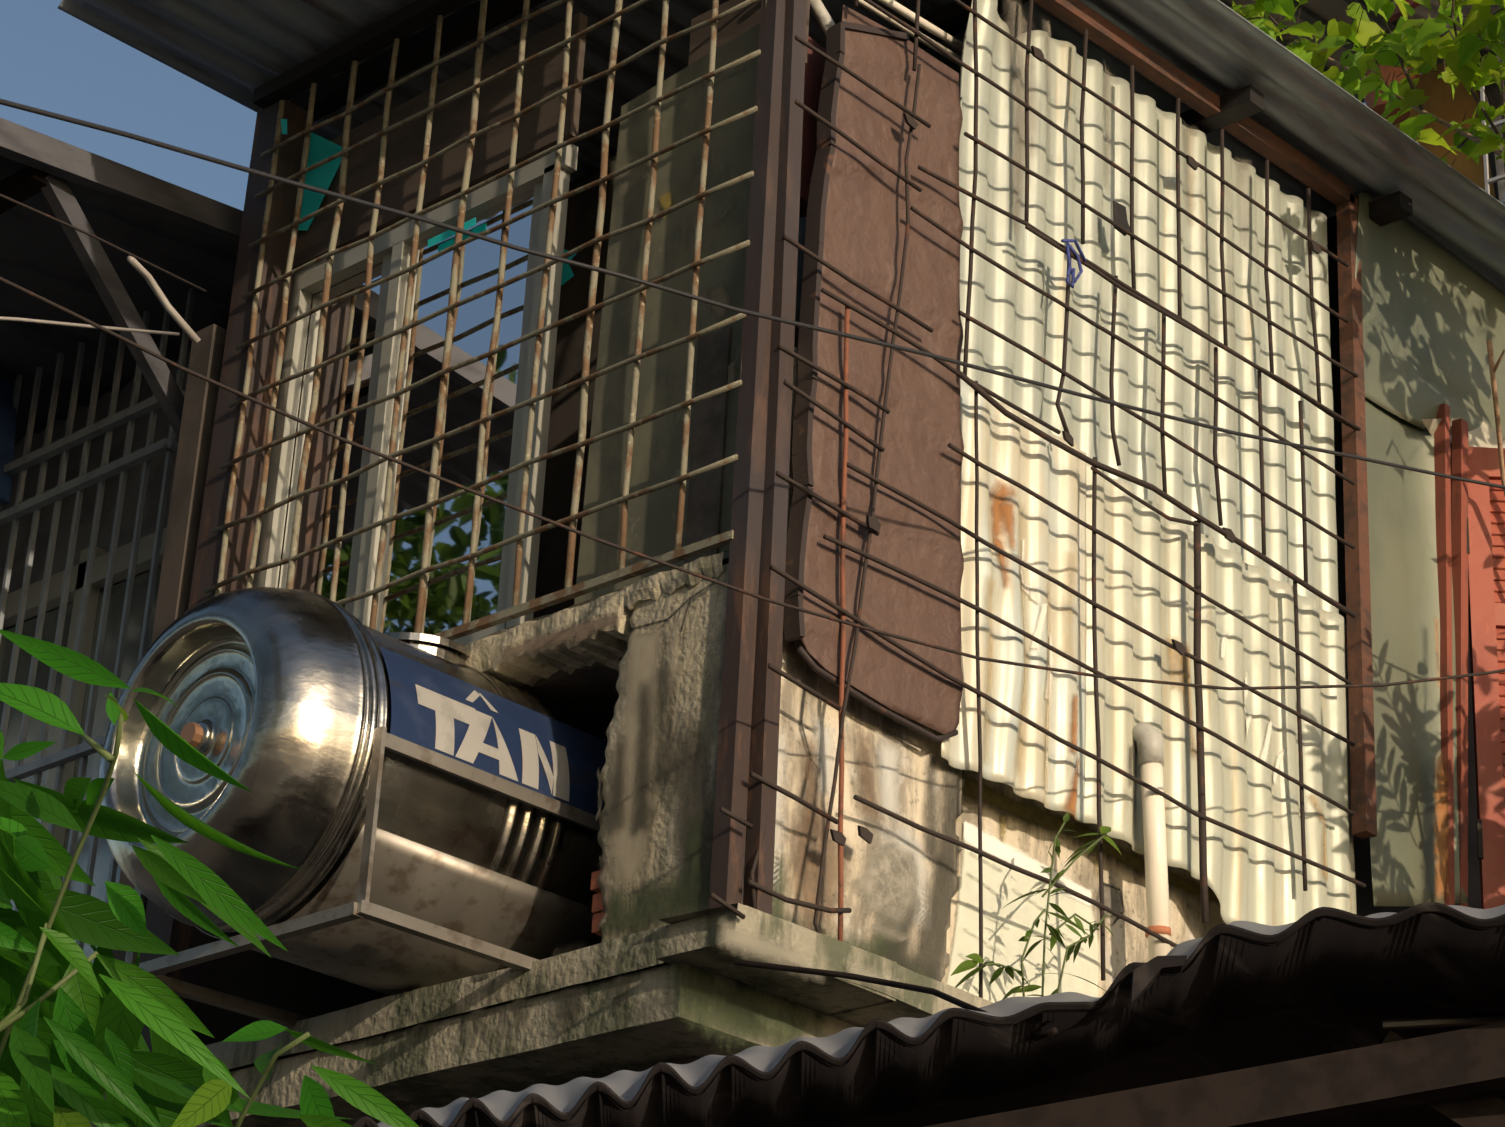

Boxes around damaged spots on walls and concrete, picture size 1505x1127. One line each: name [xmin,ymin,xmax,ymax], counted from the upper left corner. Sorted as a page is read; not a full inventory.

rust [991,482,1015,586]
spalling [503,615,617,657]
leakage [605,625,718,897]
spalling [590,857,609,936]
leakage [772,724,963,990]
leakage [725,928,811,968]
leakage [561,983,581,1019]